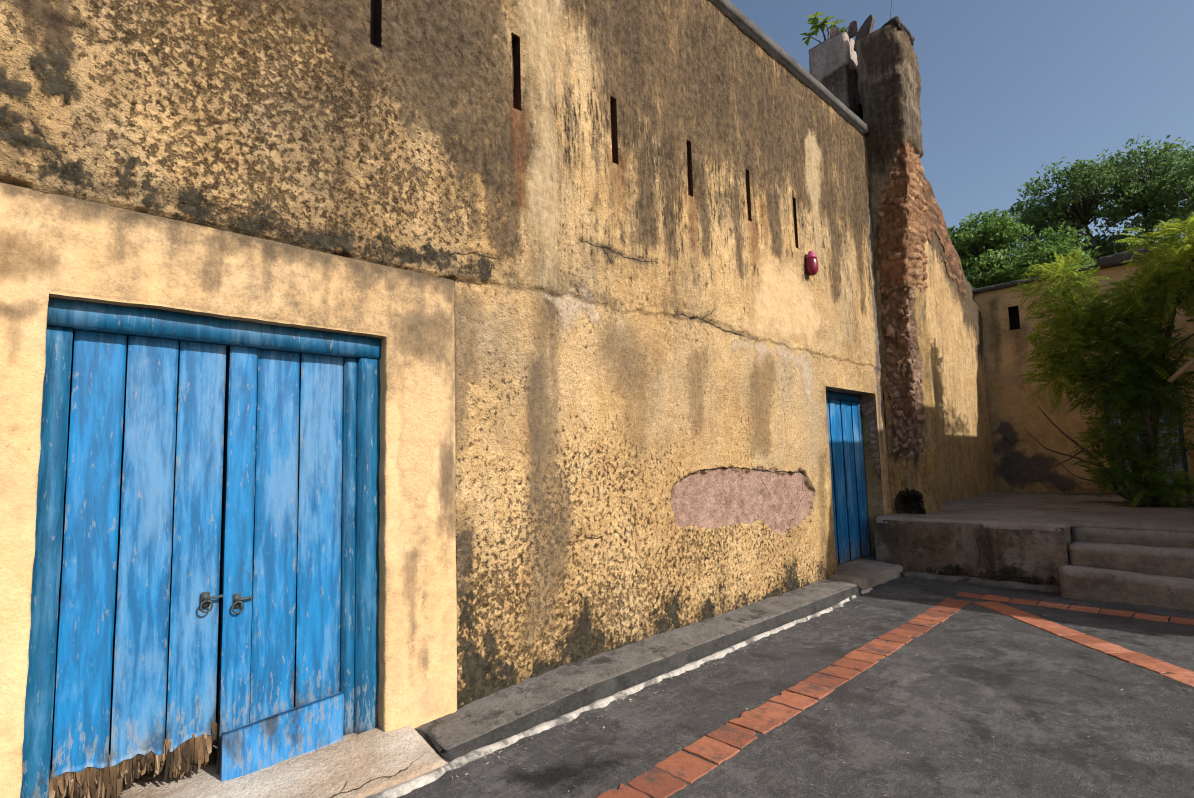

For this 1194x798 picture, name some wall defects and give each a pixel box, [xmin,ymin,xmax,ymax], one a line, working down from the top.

leakage [0,0,291,257]
leakage [296,0,545,298]
crack [676,309,754,340]
leakage [547,0,921,452]
flaking render [860,138,966,485]
leakage [456,529,828,709]
spalling [670,466,815,534]
crack [330,757,420,798]